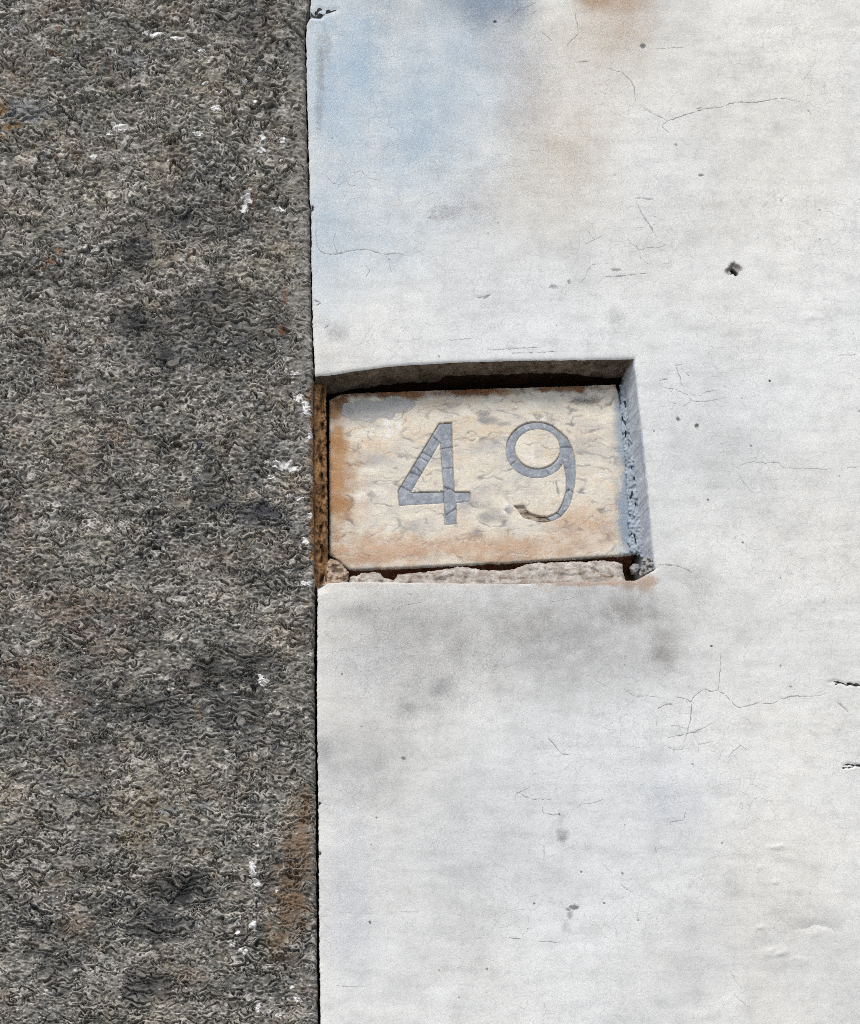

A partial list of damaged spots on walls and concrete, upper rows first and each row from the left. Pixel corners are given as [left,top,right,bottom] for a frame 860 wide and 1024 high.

crack [506,2,811,130]
crack [584,658,830,761]